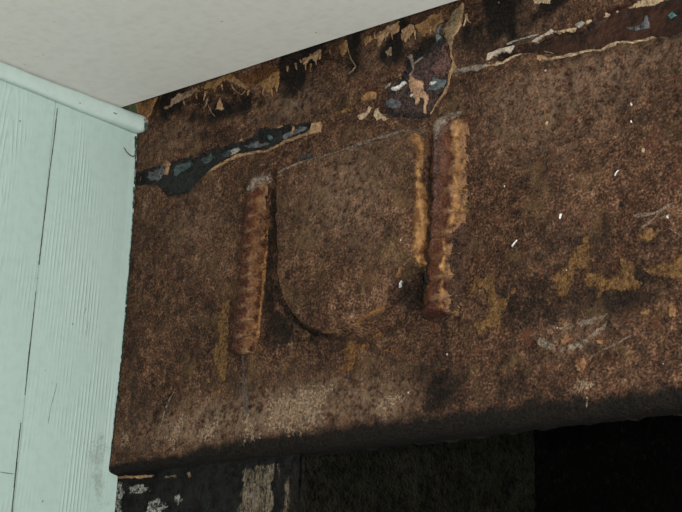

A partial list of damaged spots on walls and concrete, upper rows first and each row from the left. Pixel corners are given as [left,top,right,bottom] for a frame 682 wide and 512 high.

flaking render [140,97,158,131]
flaking render [164,73,250,116]
flaking render [286,49,331,72]
flaking render [339,40,356,74]
flaking render [357,4,471,121]
flaking render [484,0,682,67]
rust [449,120,466,224]
flaking render [109,121,323,469]
rust [252,251,268,347]